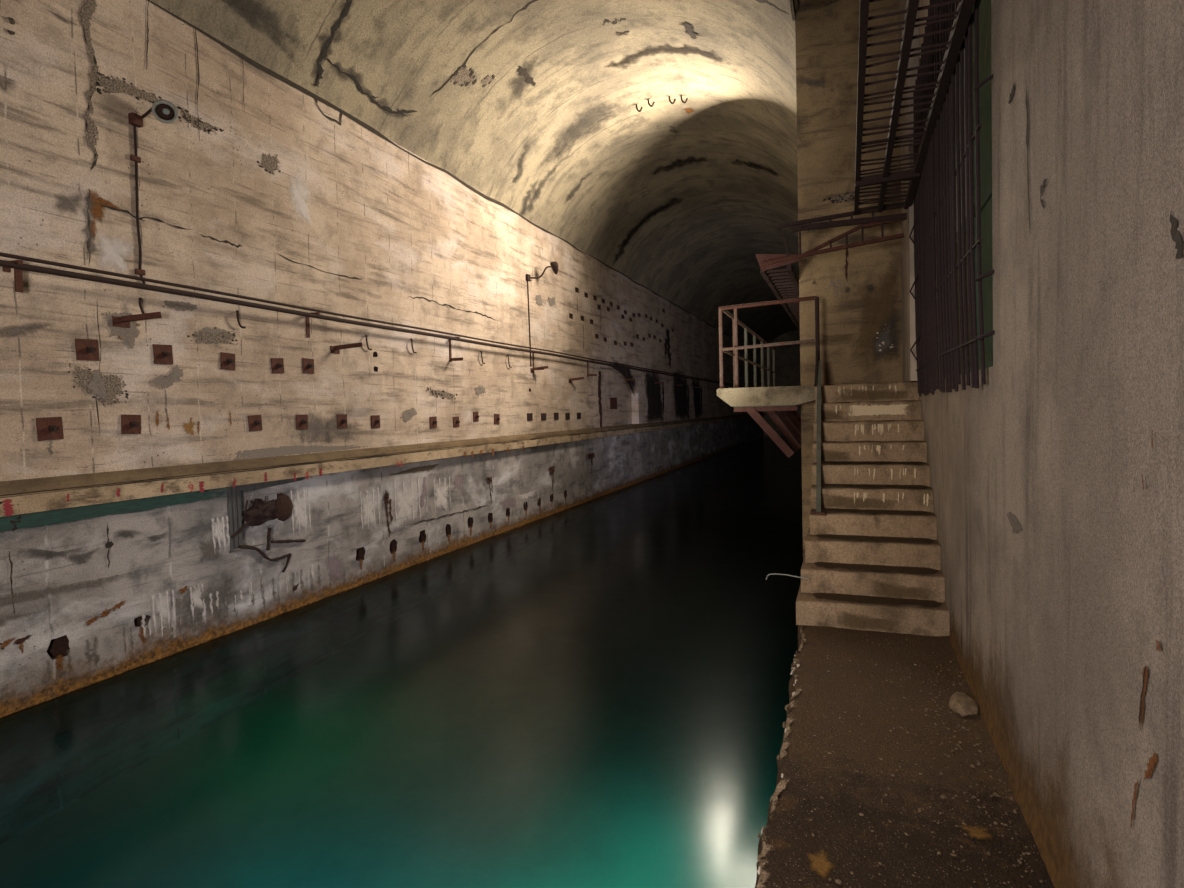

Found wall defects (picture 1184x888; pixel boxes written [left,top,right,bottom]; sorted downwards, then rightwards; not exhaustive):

crack [756,0,838,15]
crack [78,0,241,263]
crack [146,0,732,338]
corrosion [89,190,123,237]
spalling [101,311,140,349]
spalling [187,327,238,344]
corrosion [86,601,125,625]
corrosion [0,635,32,653]